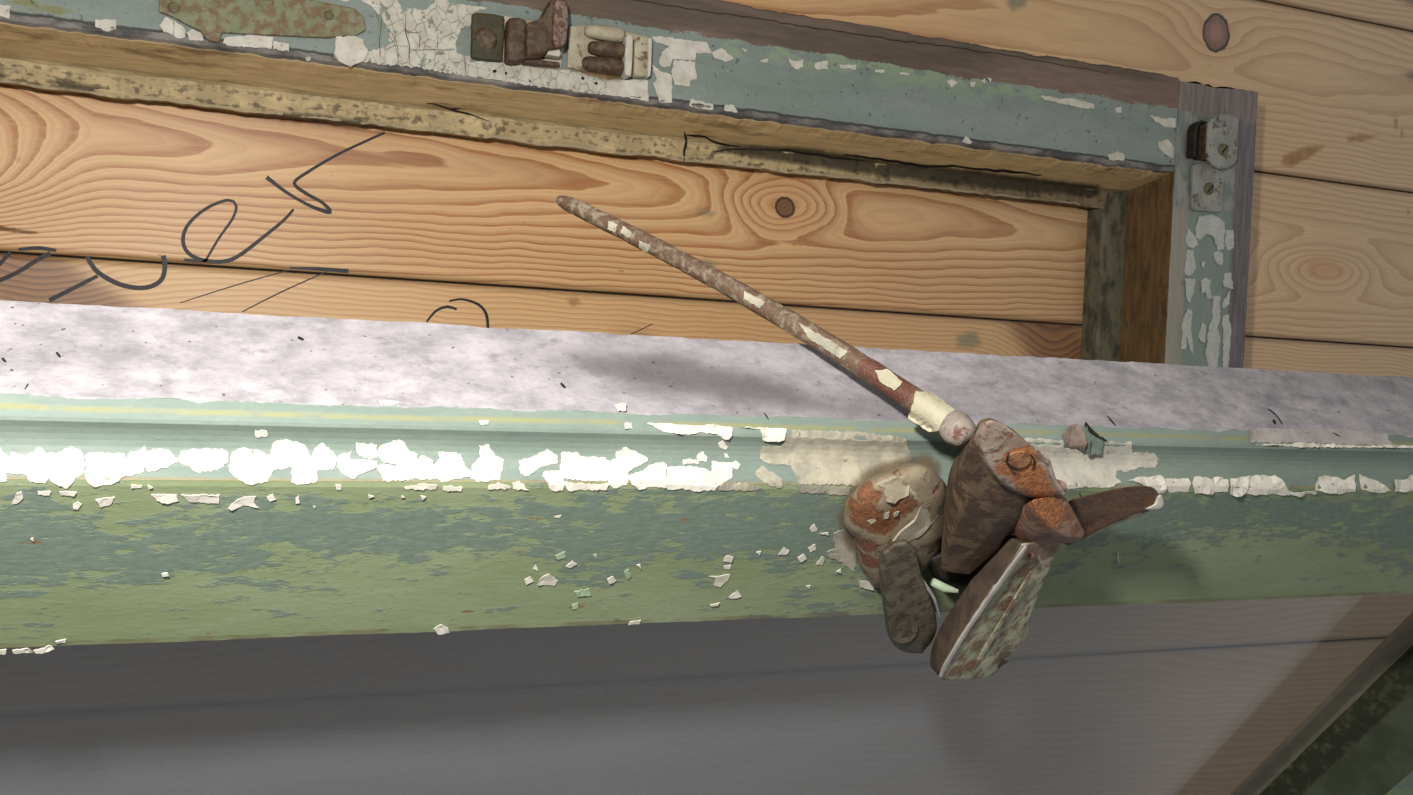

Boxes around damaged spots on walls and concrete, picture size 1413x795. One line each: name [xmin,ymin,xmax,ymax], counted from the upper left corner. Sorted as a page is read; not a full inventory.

peeling [95,19,116,32]
peeling [159,17,204,41]
peeling [223,35,289,51]
peeling [341,0,768,113]
crack [683,132,1041,176]
peeling [1181,215,1234,367]
peeling [875,369,955,432]
peeling [0,403,938,542]
rust [850,456,937,495]
peeling [1024,437,1413,497]
peeling [524,551,577,586]
peeling [709,555,742,607]